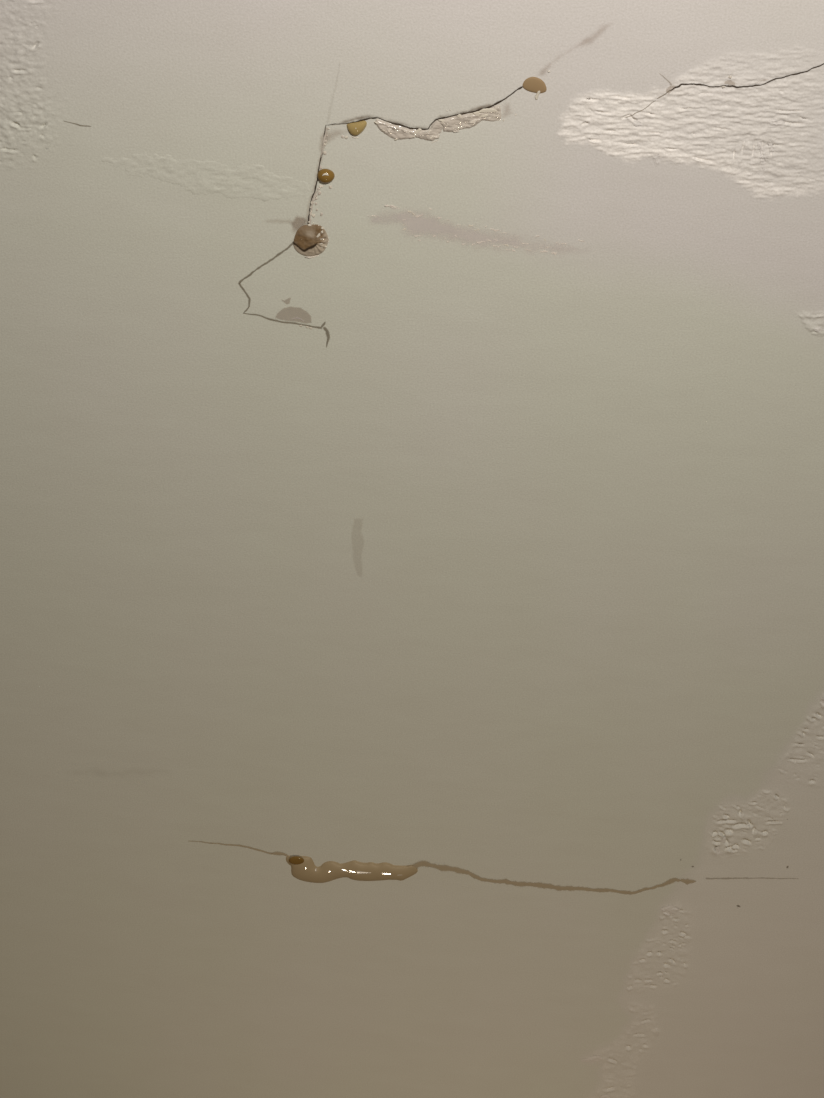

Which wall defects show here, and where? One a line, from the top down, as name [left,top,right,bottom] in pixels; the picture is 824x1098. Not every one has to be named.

crack [627,63,824,117]
spalling [552,39,824,205]
crack [239,86,523,347]
crack [192,841,288,856]
crack [413,861,696,894]